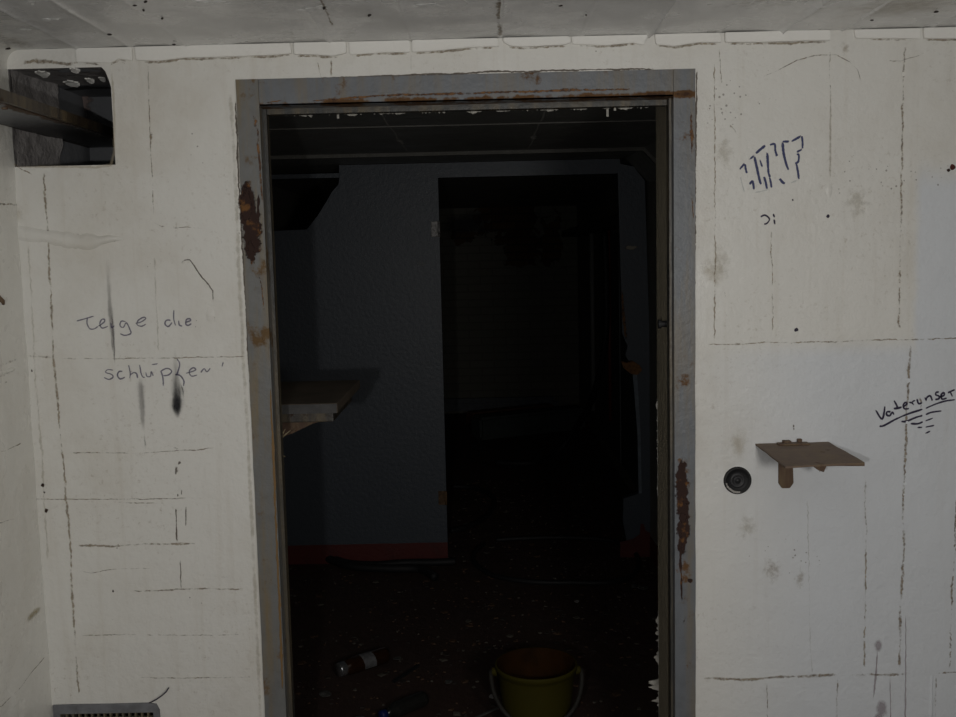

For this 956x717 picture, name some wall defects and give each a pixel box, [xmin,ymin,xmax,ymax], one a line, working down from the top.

corrosion [313,88,628,101]
corrosion [238,118,263,264]
corrosion [674,460,693,599]
peeling [648,616,659,713]